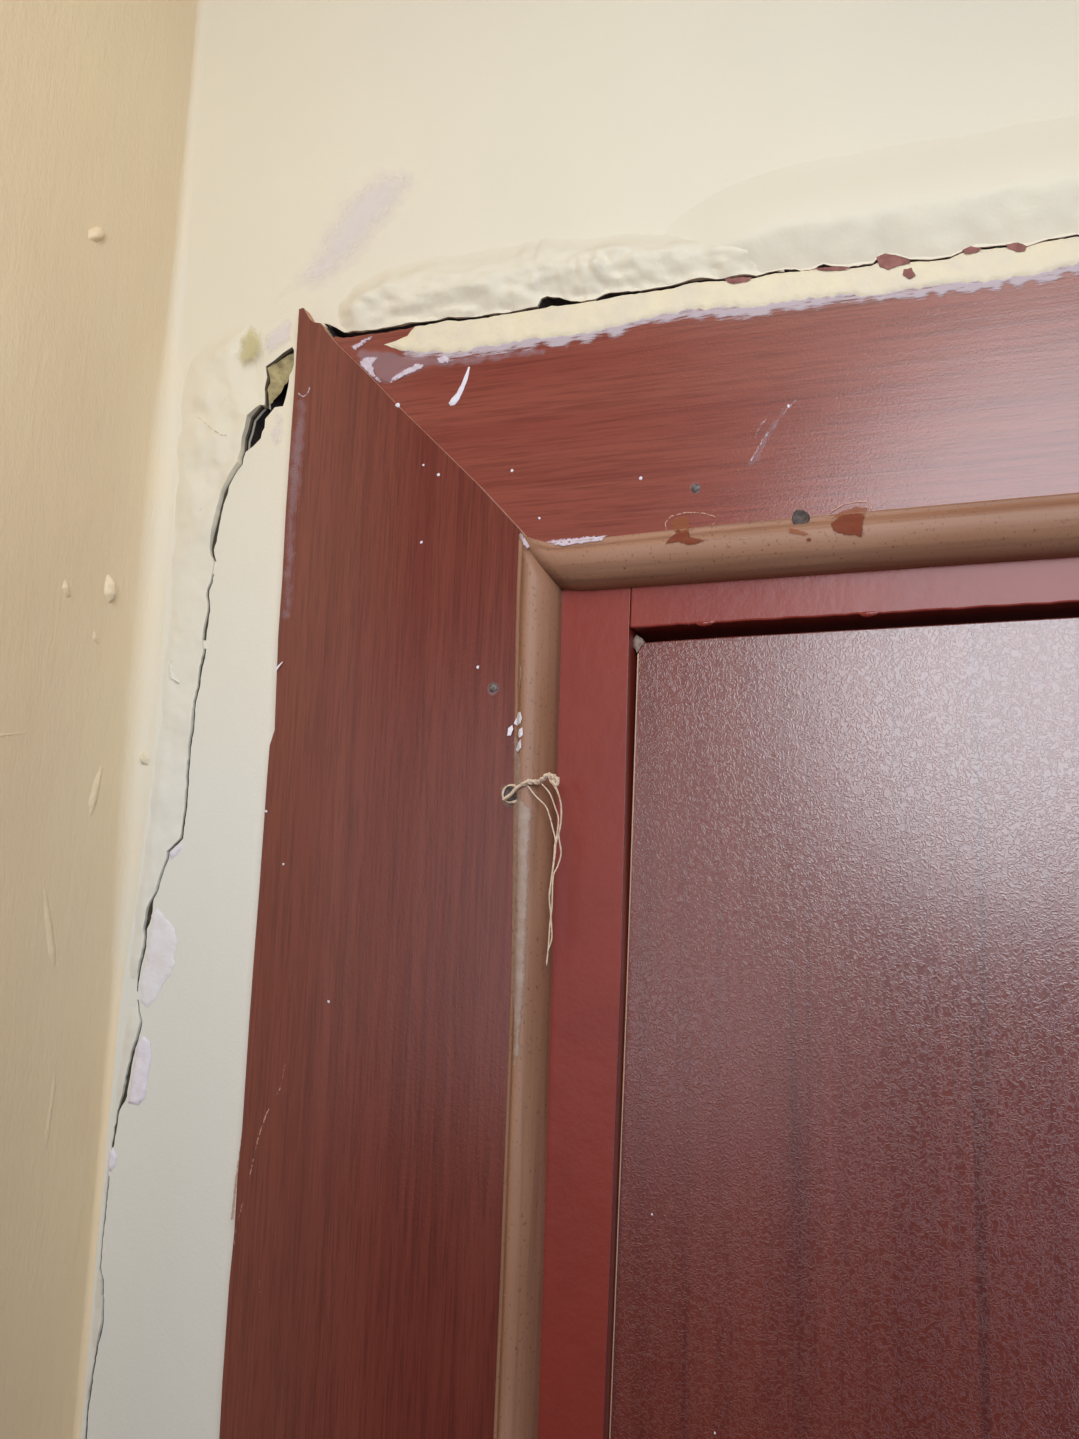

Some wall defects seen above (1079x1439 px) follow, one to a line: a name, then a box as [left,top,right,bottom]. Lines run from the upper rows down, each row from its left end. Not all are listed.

crack [325,235,1079,338]
crack [112,452,246,1147]
peeling [140,907,178,1007]
peeling [128,1036,151,1105]
crack [86,1187,109,1439]